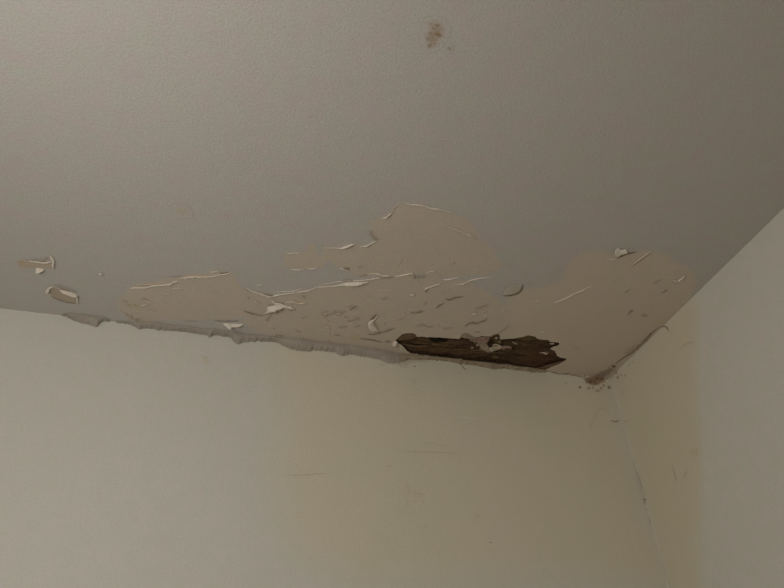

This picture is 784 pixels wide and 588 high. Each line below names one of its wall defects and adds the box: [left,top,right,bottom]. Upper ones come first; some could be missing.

peeling [46,285,78,304]
peeling [224,247,703,378]